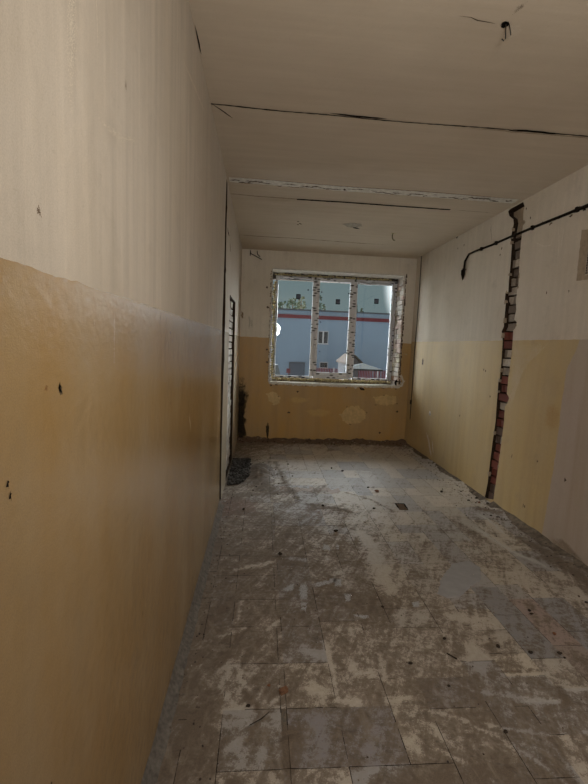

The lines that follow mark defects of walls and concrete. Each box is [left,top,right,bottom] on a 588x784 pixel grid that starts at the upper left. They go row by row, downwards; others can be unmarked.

crack [211,103,588,138]
spalling [266,268,407,406]
flaking render [487,240,521,499]